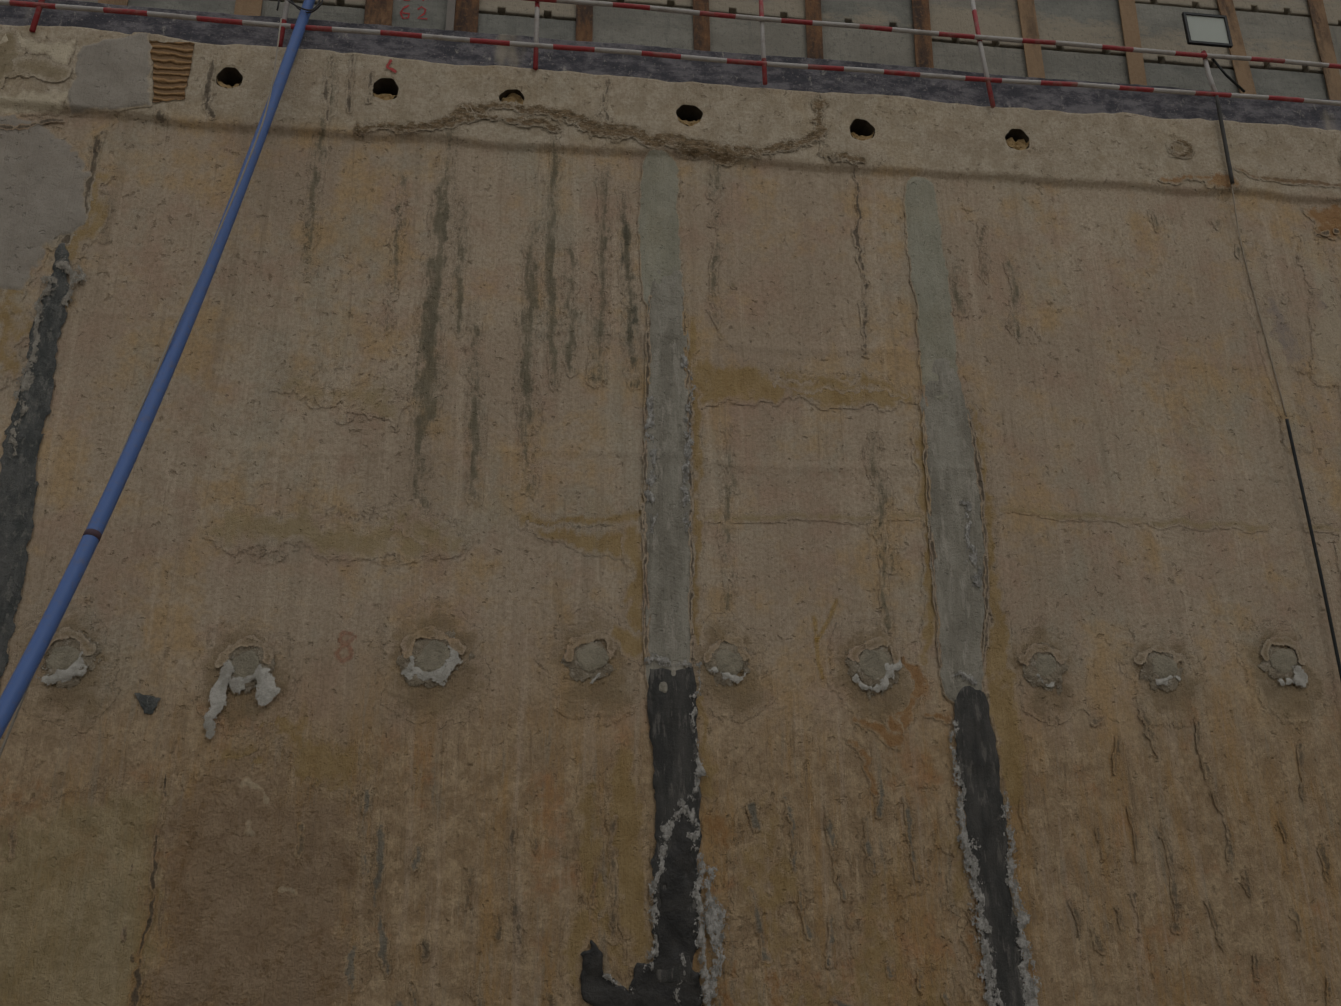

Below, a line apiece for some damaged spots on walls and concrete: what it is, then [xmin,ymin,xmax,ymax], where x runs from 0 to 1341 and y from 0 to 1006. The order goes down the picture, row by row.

leakage [404,124,489,512]
leakage [513,132,642,497]